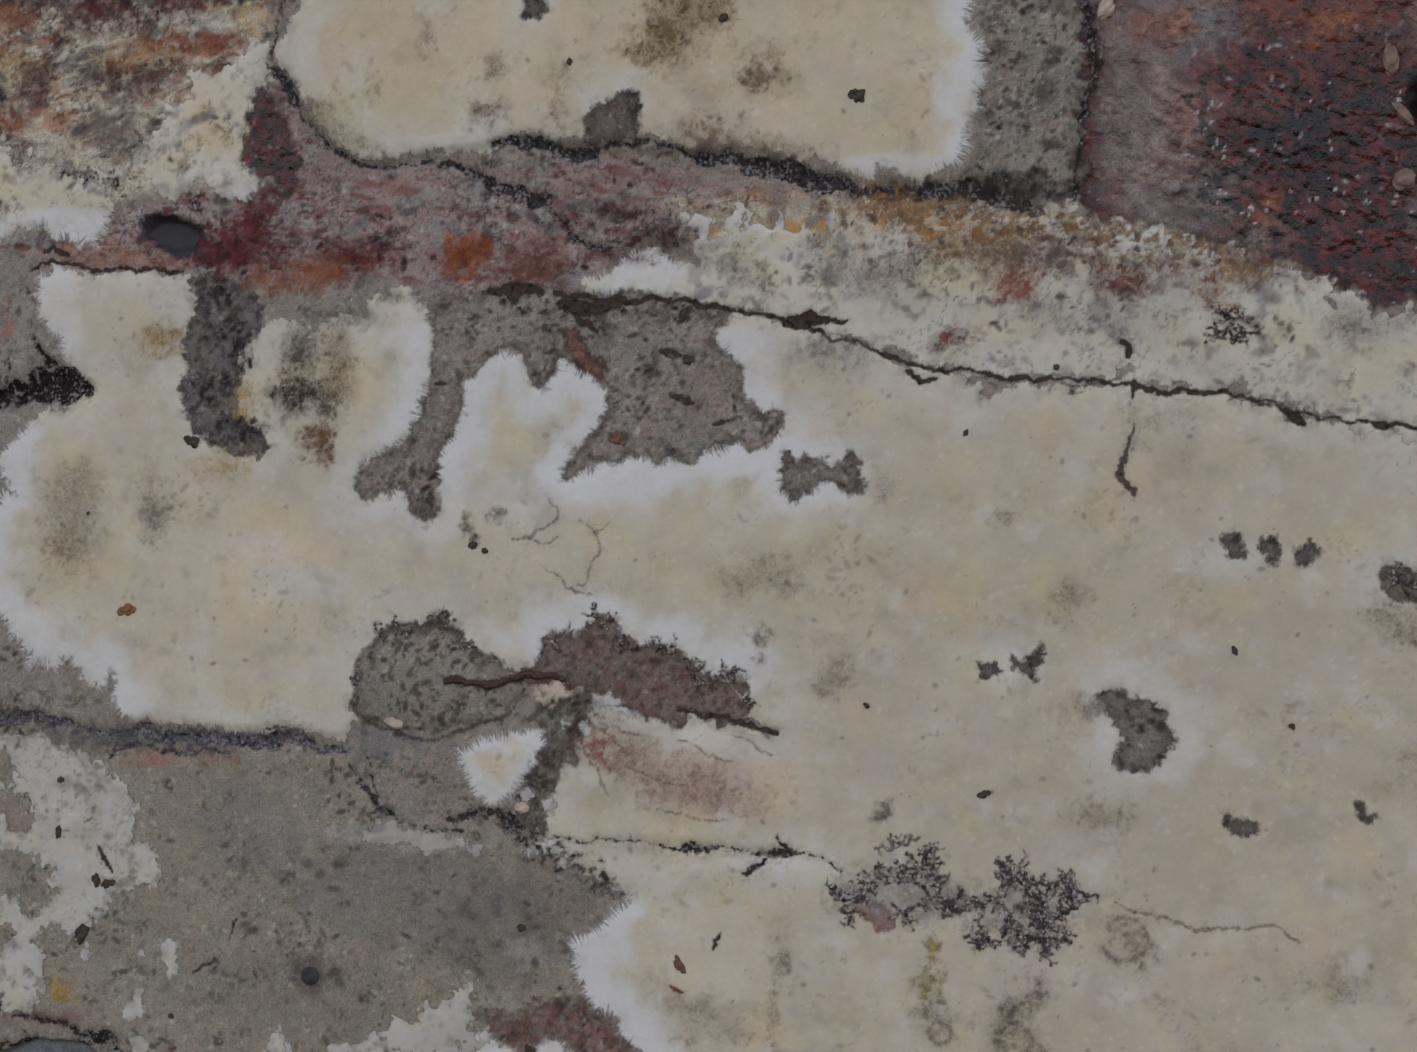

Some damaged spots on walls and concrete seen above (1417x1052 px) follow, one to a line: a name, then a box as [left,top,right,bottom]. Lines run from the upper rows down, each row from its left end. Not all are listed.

rust [0,0,234,106]
crack [267,0,1104,252]
rust [185,193,381,293]
rust [600,203,698,261]
peeling [576,0,1417,427]
rust [822,183,1273,310]
crack [0,336,94,410]
crack [487,282,1417,496]
peeling [0,258,1417,1052]
crack [0,708,842,877]